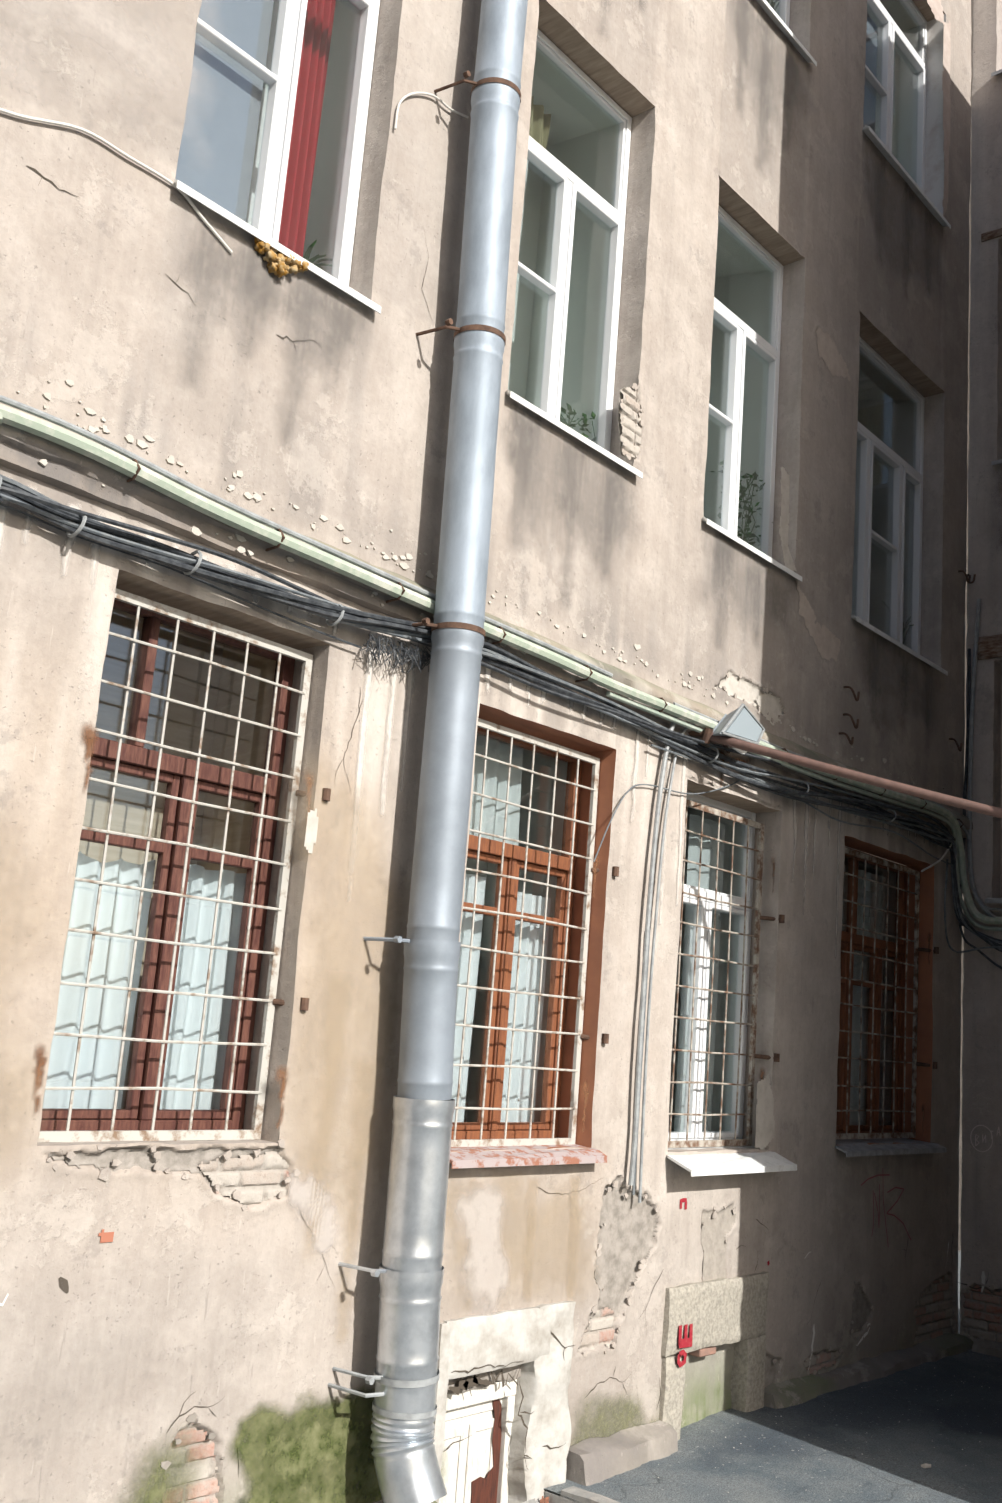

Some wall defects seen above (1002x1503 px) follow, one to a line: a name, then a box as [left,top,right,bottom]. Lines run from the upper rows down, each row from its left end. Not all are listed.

peeling [42,379,155,453]
peeling [224,470,299,510]
peeling [190,525,254,556]
peeling [310,515,438,578]
spalling [536,611,819,747]
spalling [46,1139,301,1211]
spalling [578,1177,661,1357]
spalling [960,1284,1002,1343]
crack [449,1361,563,1467]
spalling [161,1412,225,1503]